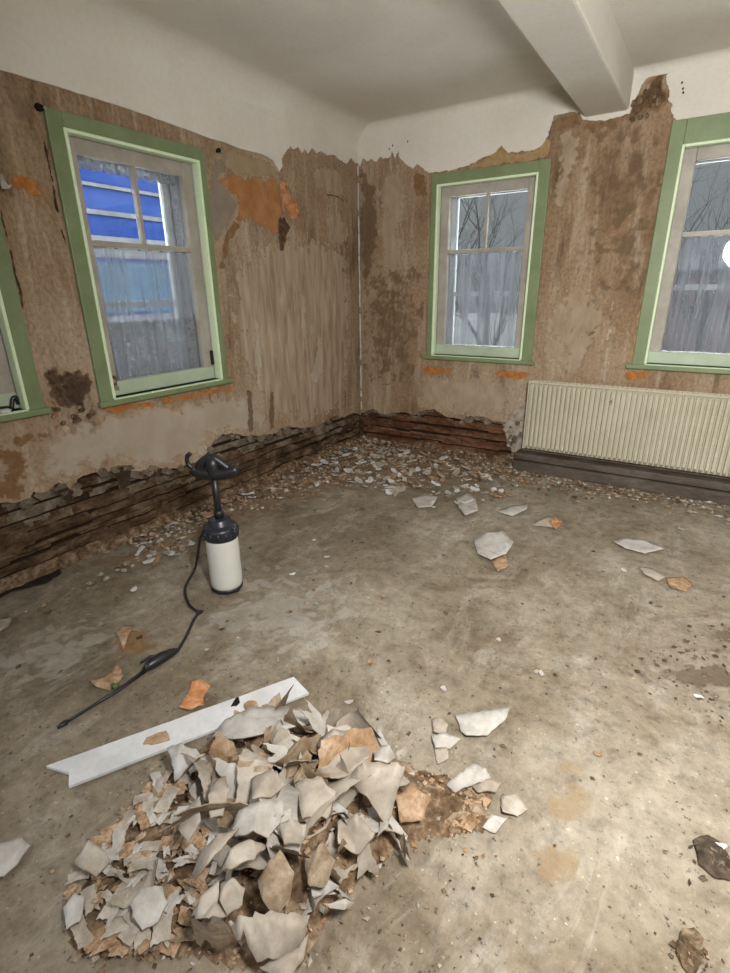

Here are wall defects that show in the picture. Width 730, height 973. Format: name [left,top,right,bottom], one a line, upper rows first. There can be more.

flaking render [553,74,670,132]
peeling [216,147,300,268]
water stain [226,212,351,432]
water stain [359,173,423,385]
flaking render [0,401,527,593]